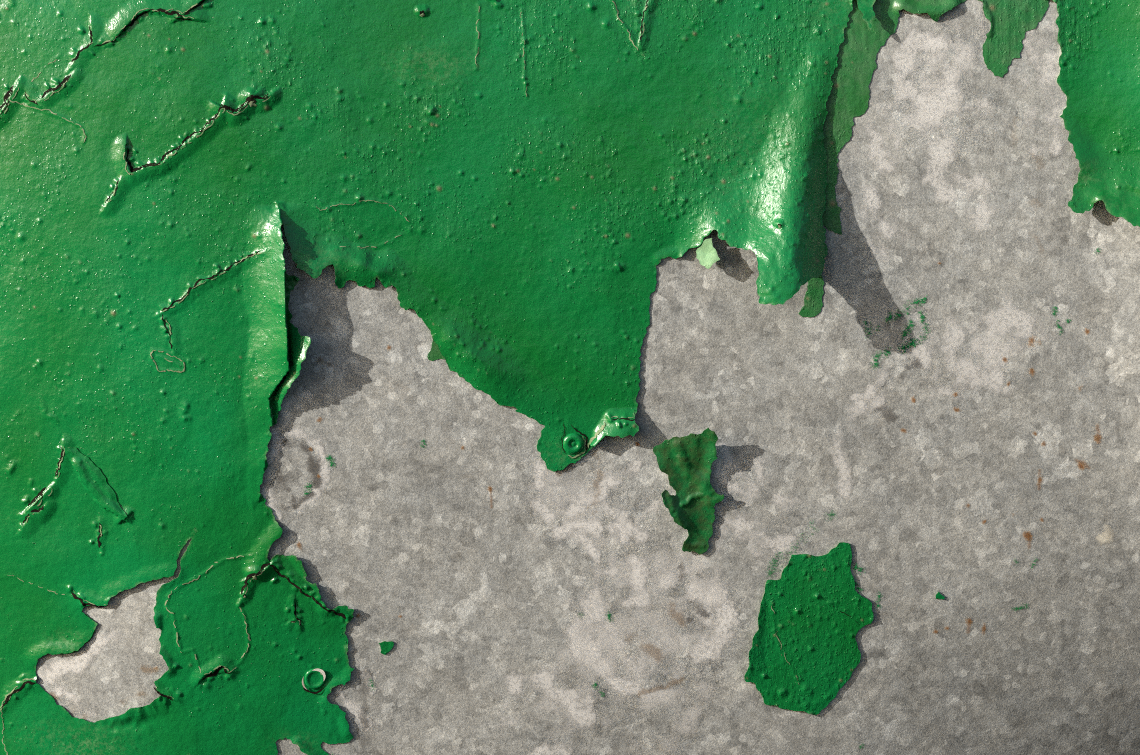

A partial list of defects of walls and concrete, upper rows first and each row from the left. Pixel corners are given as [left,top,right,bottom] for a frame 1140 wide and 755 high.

crack [0,0,205,114]
crack [105,93,271,203]
crack [161,251,262,349]
peeling [250,0,1140,755]
peeling [35,539,191,722]